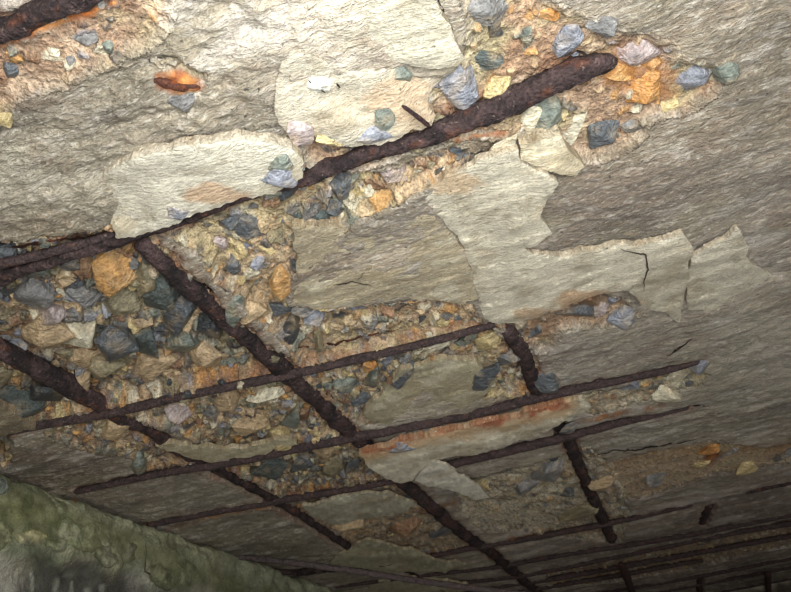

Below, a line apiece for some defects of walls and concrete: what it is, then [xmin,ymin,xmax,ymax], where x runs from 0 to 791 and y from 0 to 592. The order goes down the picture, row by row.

rust [31,6,99,35]
spalling [0,0,209,129]
rust [163,71,197,93]
spalling [148,0,772,432]
spalling [0,224,115,258]
crack [622,249,649,287]
spalling [0,240,791,574]
spalling [545,520,791,588]
damp [29,558,142,592]